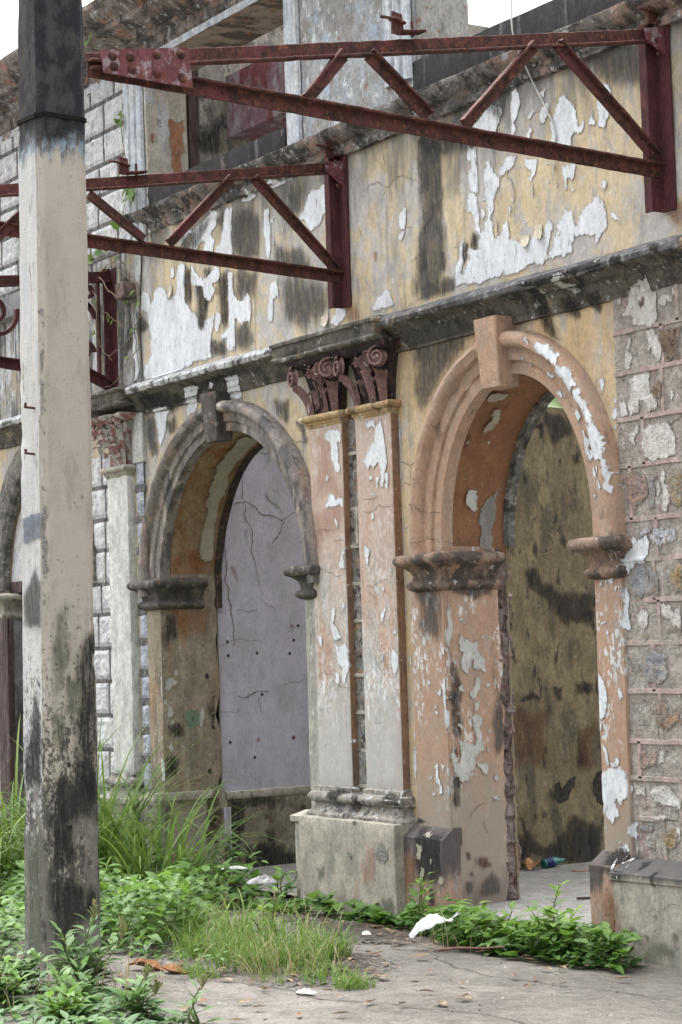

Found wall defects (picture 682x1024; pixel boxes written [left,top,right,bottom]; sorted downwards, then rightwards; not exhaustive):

peeling [473,87,609,146]
peeling [179,189,256,255]
damp [415,136,470,299]
peeling [454,147,620,287]
peeling [131,263,252,381]
damp [535,412,571,443]
peeling [521,278,682,512]
crack [234,481,295,581]
crack [216,546,312,645]
damp [527,545,593,625]
damp [25,609,98,953]
damp [517,816,657,886]